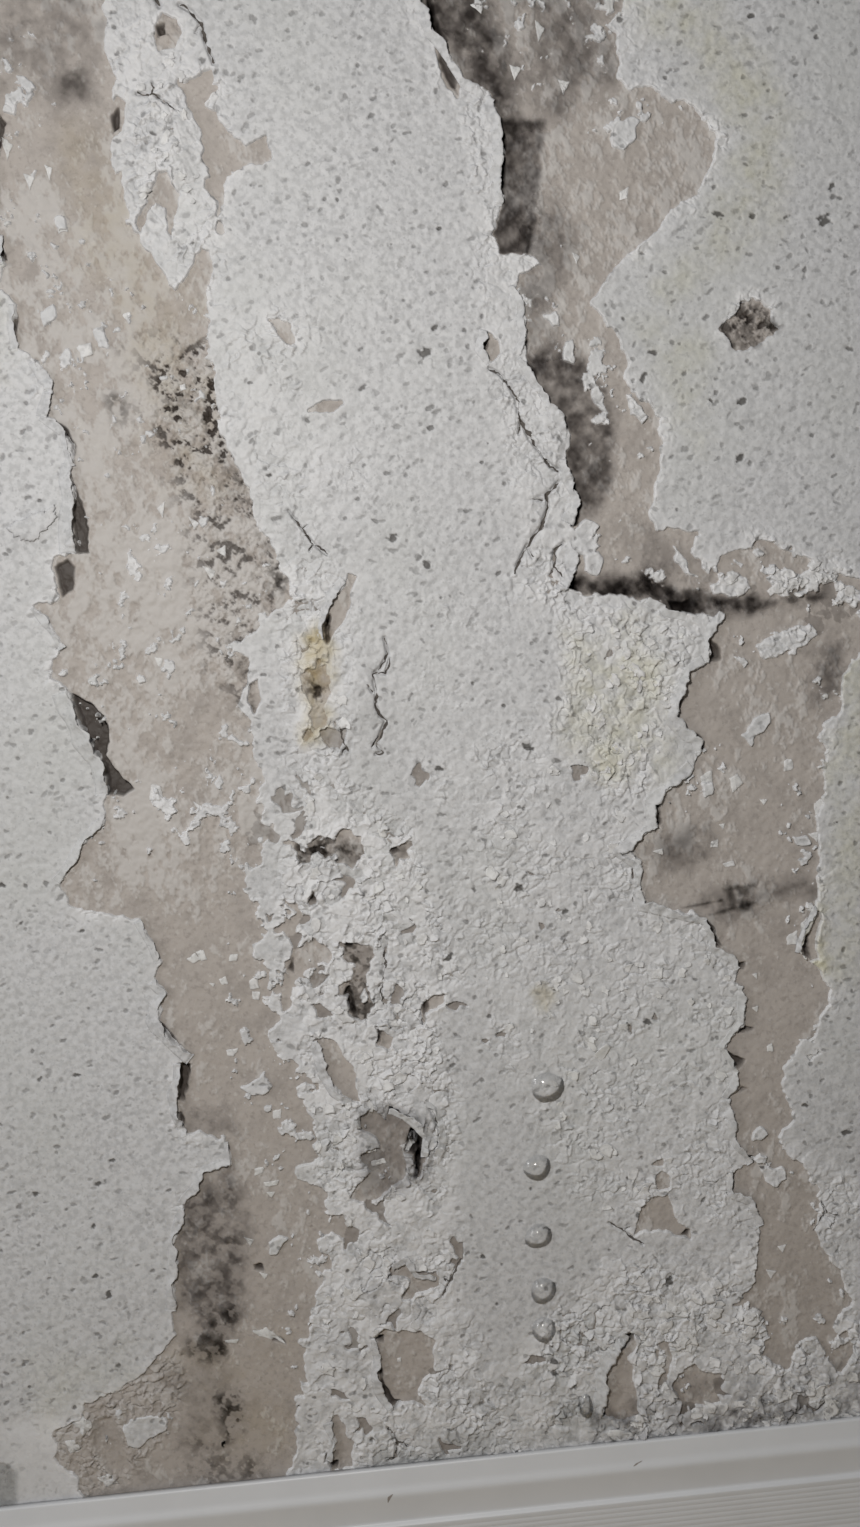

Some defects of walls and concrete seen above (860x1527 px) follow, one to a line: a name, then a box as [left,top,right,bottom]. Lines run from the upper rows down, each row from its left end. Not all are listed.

water stain [426,2,504,104]
water stain [495,121,539,254]
water stain [532,354,582,384]
water stain [559,398,610,503]
water stain [569,574,698,607]
peeling [0,0,467,1497]
peeling [411,0,860,1441]
water stain [218,1396,239,1434]
peeling [438,1418,477,1454]